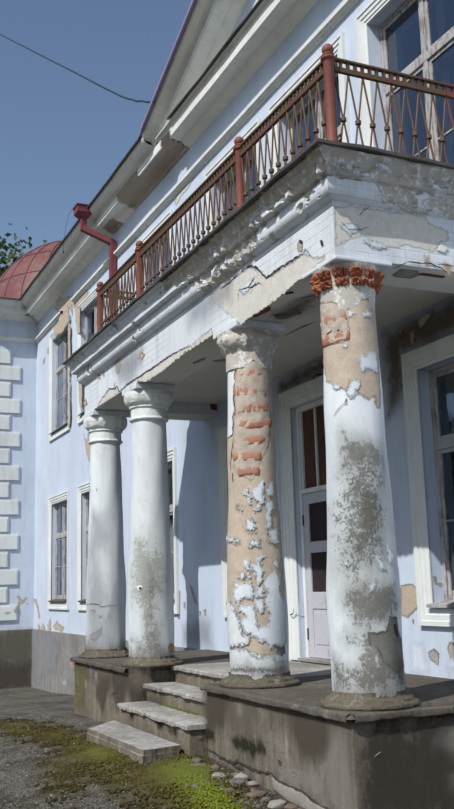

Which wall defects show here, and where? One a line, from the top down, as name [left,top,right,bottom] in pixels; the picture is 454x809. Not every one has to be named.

peeling [334,203,449,253]
crack [222,249,310,290]
peeling [209,253,446,408]
peeling [226,361,287,657]
leakage [347,488,379,559]
peeling [4,596,64,632]
flaking render [367,584,417,673]
peeling [428,642,454,665]
crack [197,735,328,809]